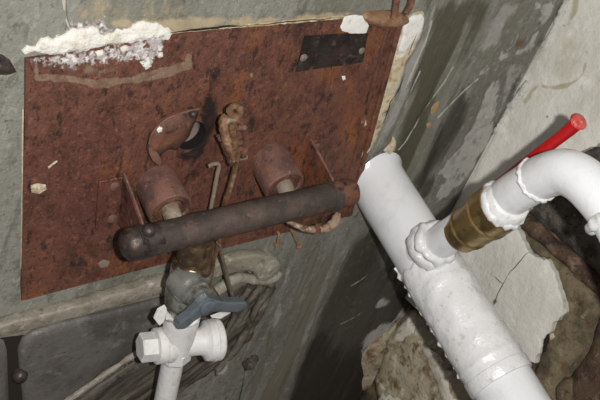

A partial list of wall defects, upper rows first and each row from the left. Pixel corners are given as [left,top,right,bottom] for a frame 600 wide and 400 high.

spalling [583,147,600,162]
crack [493,252,529,304]
spalling [520,195,600,400]
spalling [358,304,472,400]